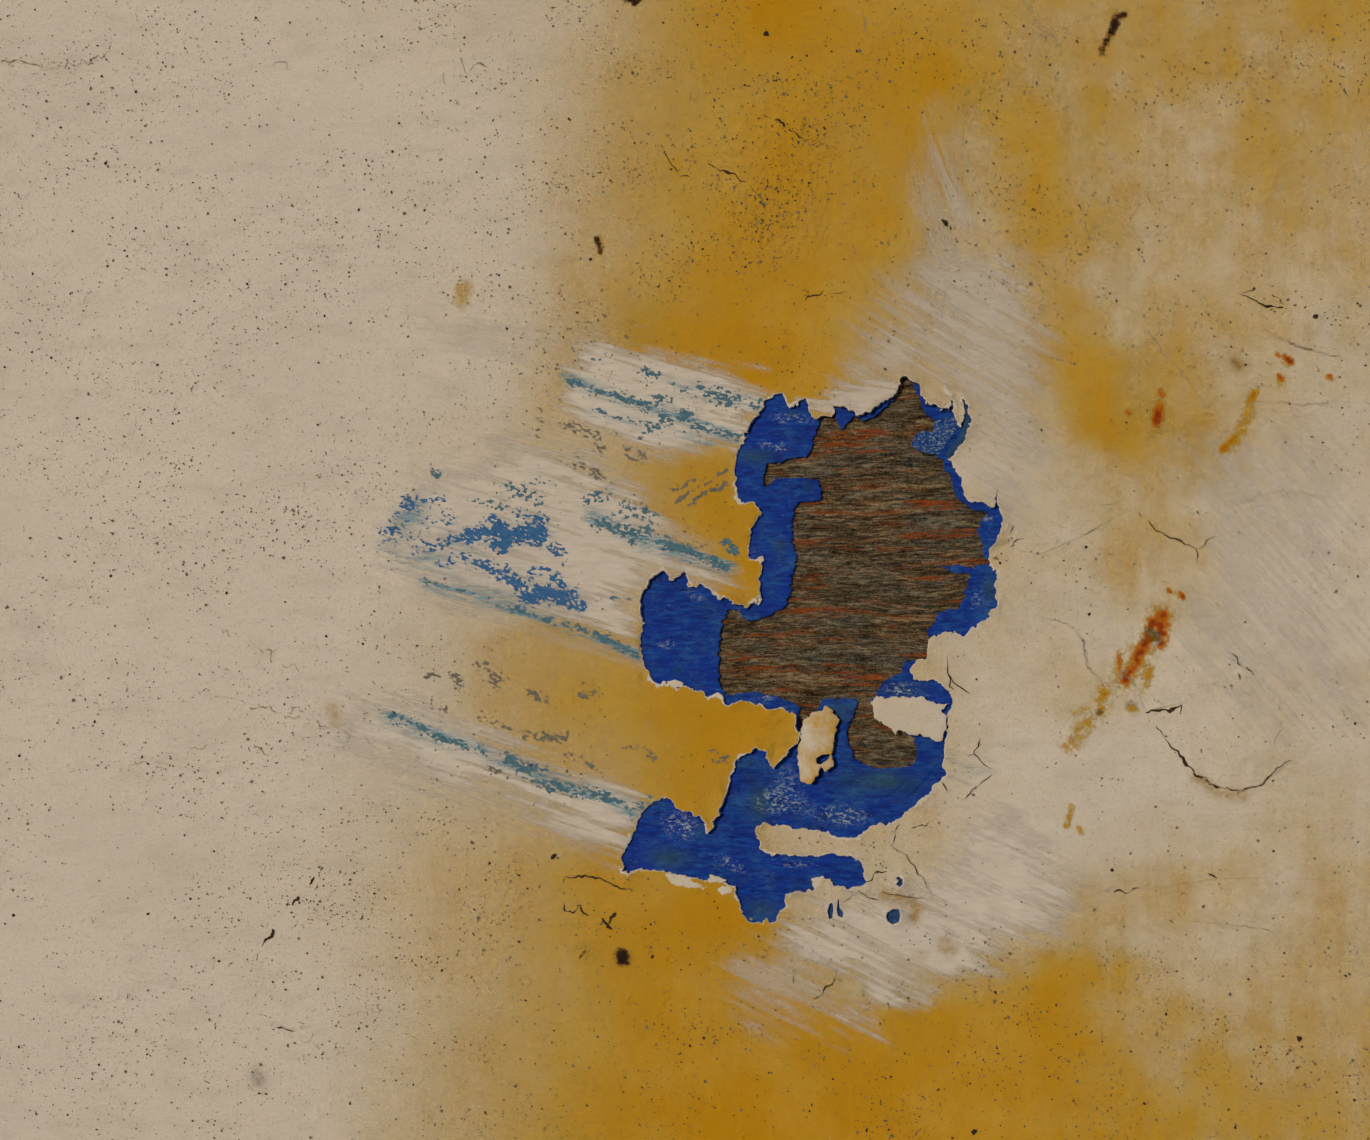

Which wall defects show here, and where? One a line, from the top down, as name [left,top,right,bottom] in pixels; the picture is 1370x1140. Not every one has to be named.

rust [1151,388,1165,434]
rust [1219,388,1259,454]
crack [1056,503,1213,558]
peeling [622,377,1003,924]
rust [1063,588,1186,751]
crack [1049,619,1292,791]